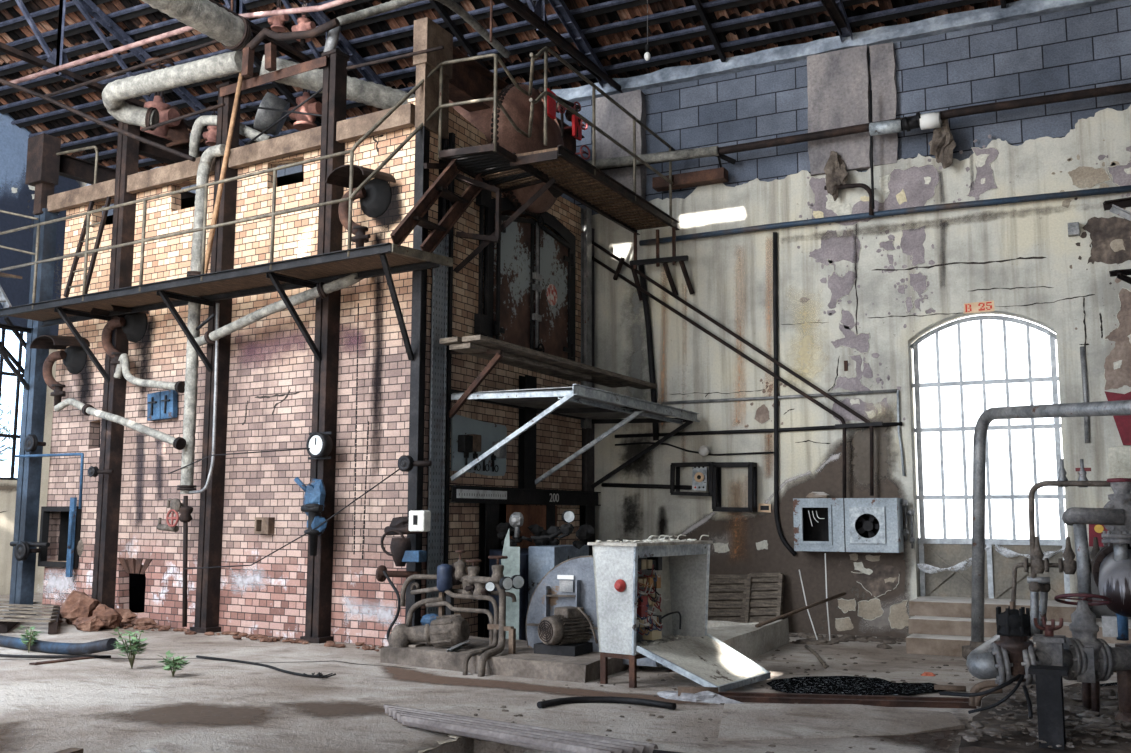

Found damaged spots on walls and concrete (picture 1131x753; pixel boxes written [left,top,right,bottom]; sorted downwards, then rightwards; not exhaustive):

flaking render [953,134,1011,203]
flaking render [797,159,943,424]
spalling [1052,146,1131,390]
damp [622,437,651,474]
damp [623,494,639,532]
spalling [835,553,909,631]